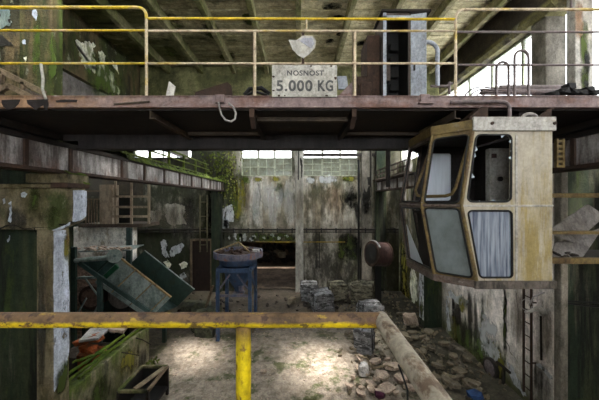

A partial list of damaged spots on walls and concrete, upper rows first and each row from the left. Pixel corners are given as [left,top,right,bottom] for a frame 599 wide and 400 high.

flaking render [75,39,122,96]
flaking render [150,203,187,226]
mould [344,186,358,218]
peeling [53,190,87,312]
flaking render [161,239,188,279]
mould [337,233,361,261]
peeling [53,328,69,394]
water stain [450,292,506,379]